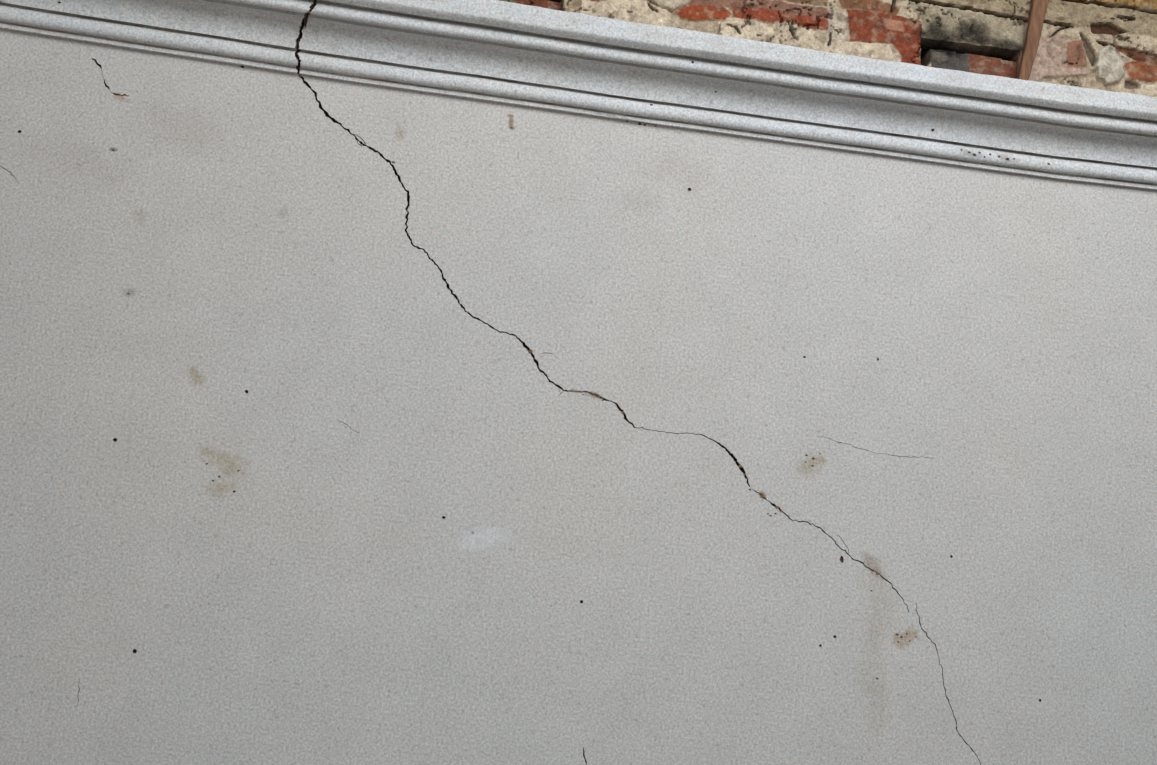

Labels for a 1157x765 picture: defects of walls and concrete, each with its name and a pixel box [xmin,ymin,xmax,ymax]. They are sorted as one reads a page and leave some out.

crack [295,0,981,765]